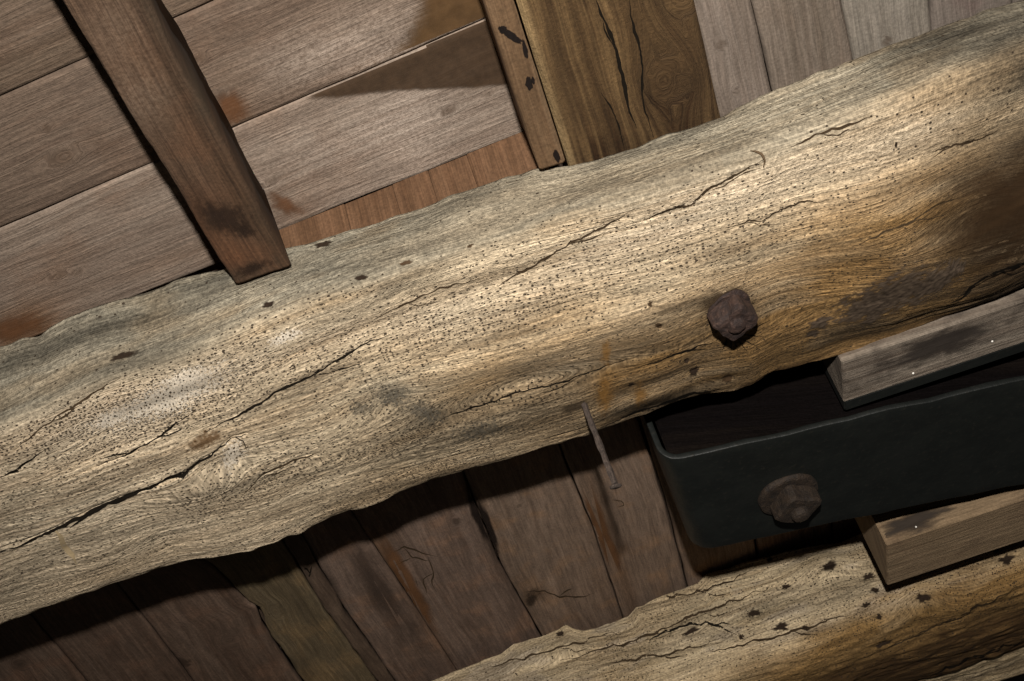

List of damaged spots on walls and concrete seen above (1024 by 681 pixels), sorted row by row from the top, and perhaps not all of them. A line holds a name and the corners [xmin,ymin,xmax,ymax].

crack [596,0,653,145]
crack [791,116,872,147]
crack [932,129,999,158]
crack [0,161,770,553]
leakage [900,327,986,364]
crack [481,570,860,672]
crack [860,584,1024,660]
crack [930,640,1022,677]